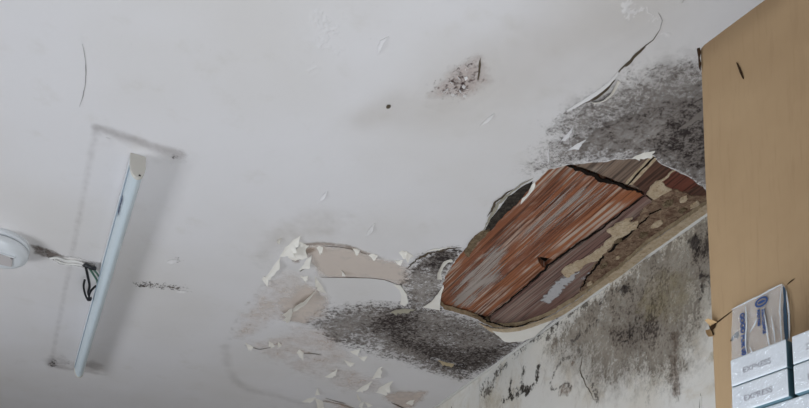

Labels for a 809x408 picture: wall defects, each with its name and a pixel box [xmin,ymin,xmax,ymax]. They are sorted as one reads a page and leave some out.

crack [566,14,663,112]
damp [536,62,706,184]
spalling [464,229,490,257]
damp [485,182,532,231]
damp [524,186,605,244]
spalling [627,195,700,239]
peeling [261,236,413,323]
damp [308,217,711,403]
peeling [357,367,423,408]